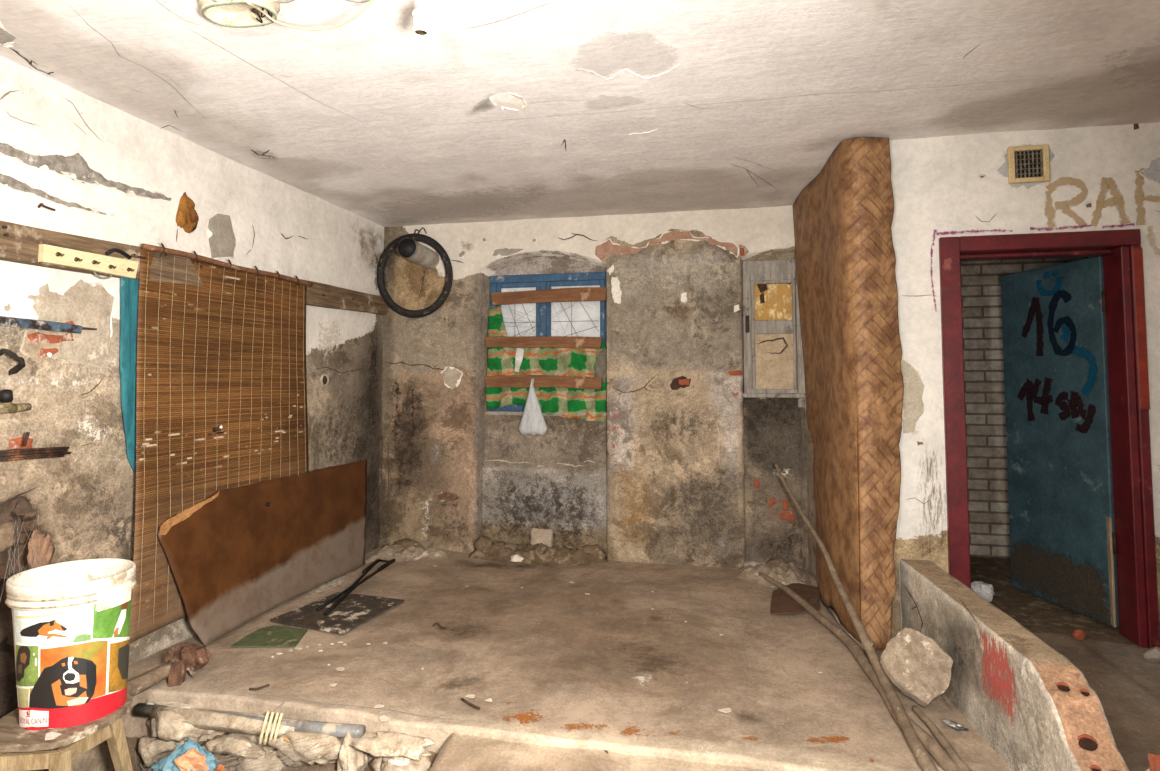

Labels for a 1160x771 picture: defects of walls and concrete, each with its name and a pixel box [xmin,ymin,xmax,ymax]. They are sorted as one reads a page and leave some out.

peeling [0,21,16,47]
flaking render [0,173,114,217]
flaking render [0,141,172,201]
flaking render [594,231,749,304]
peeling [20,278,115,367]
leakage [393,381,439,488]
leakage [492,462,593,539]
flaking render [0,496,32,677]
rust [503,702,542,726]
rust [560,723,607,731]
spalling [1056,682,1090,696]
spalling [1077,734,1098,751]